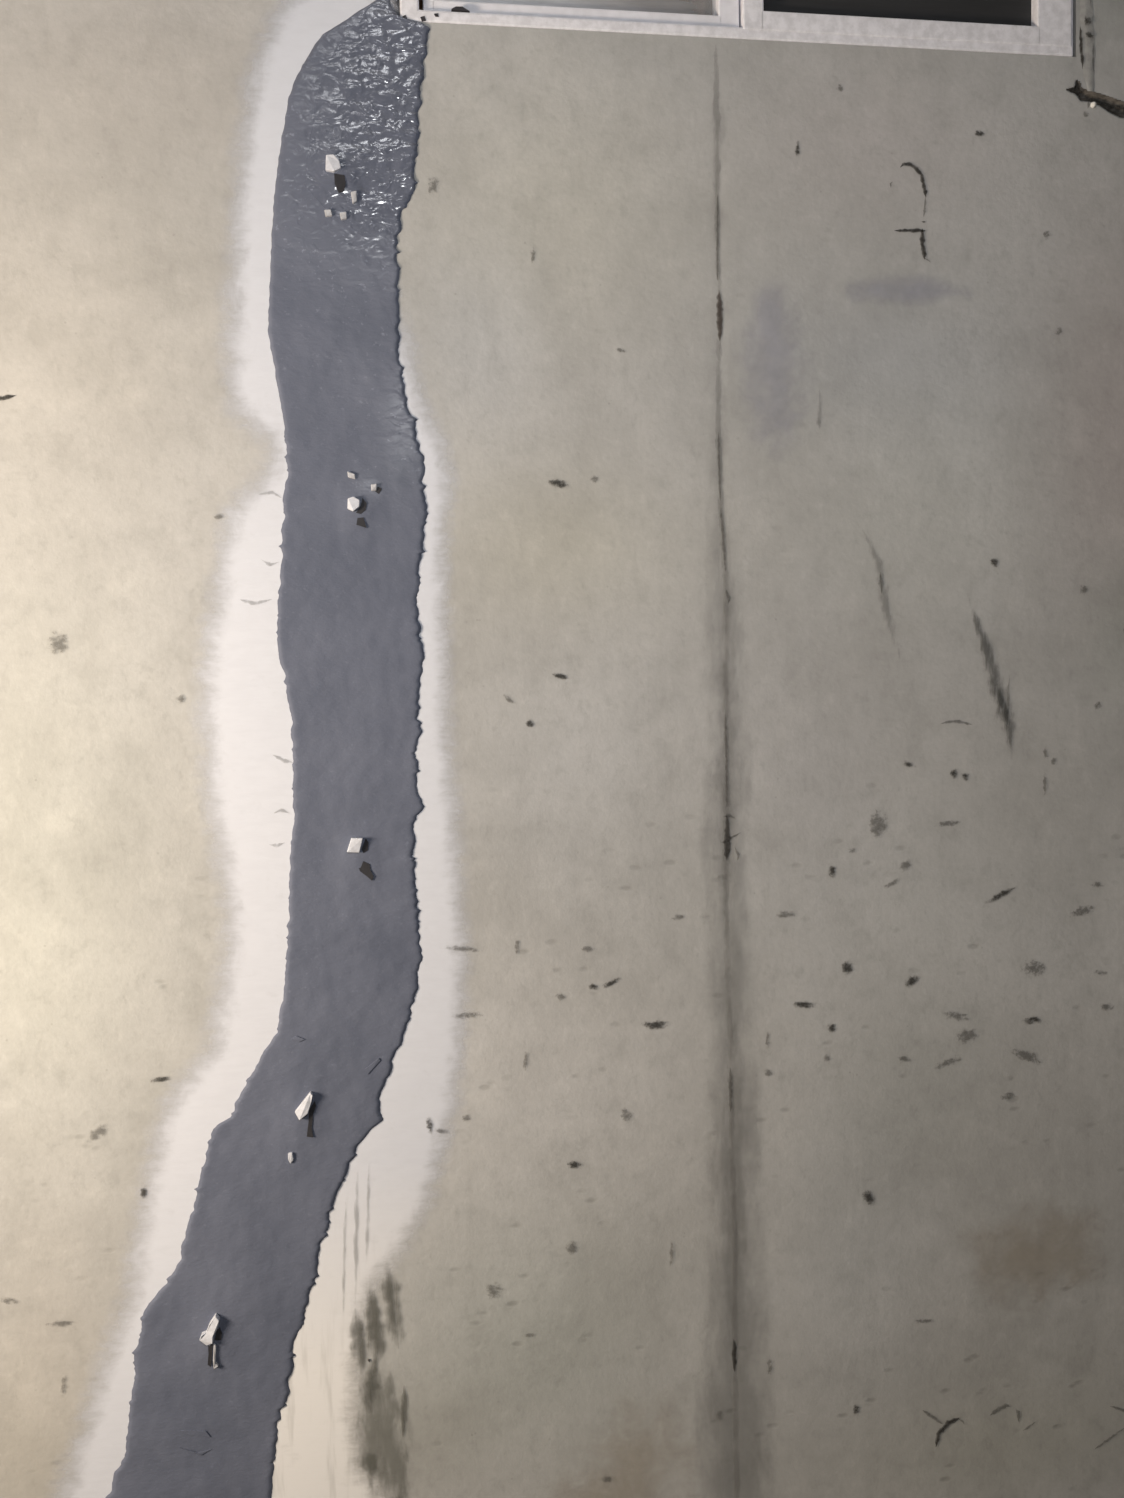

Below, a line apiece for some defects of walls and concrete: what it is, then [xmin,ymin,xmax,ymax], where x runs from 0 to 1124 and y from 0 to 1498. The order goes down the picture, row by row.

crack [895,162,927,259]
crack [716,293,724,340]
damp [60,0,375,1498]
crack [723,814,731,859]
damp [271,330,467,1498]
crack [730,1340,738,1371]